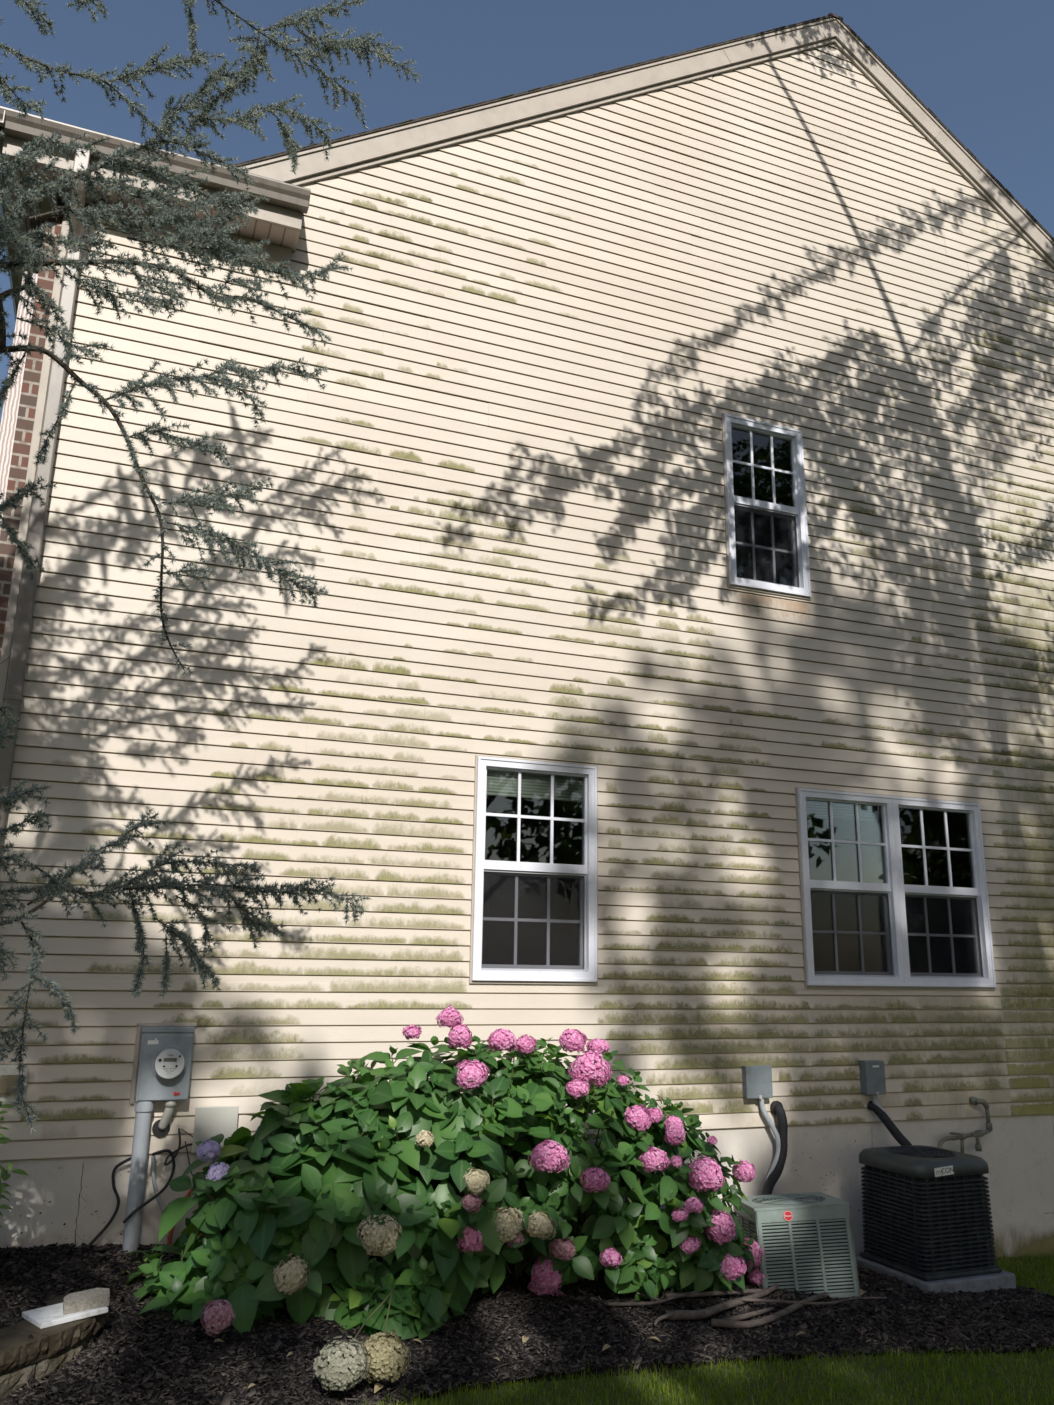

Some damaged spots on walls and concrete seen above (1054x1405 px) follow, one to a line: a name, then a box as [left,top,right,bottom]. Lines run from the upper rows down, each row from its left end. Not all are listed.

damp [993,1234,1054,1258]